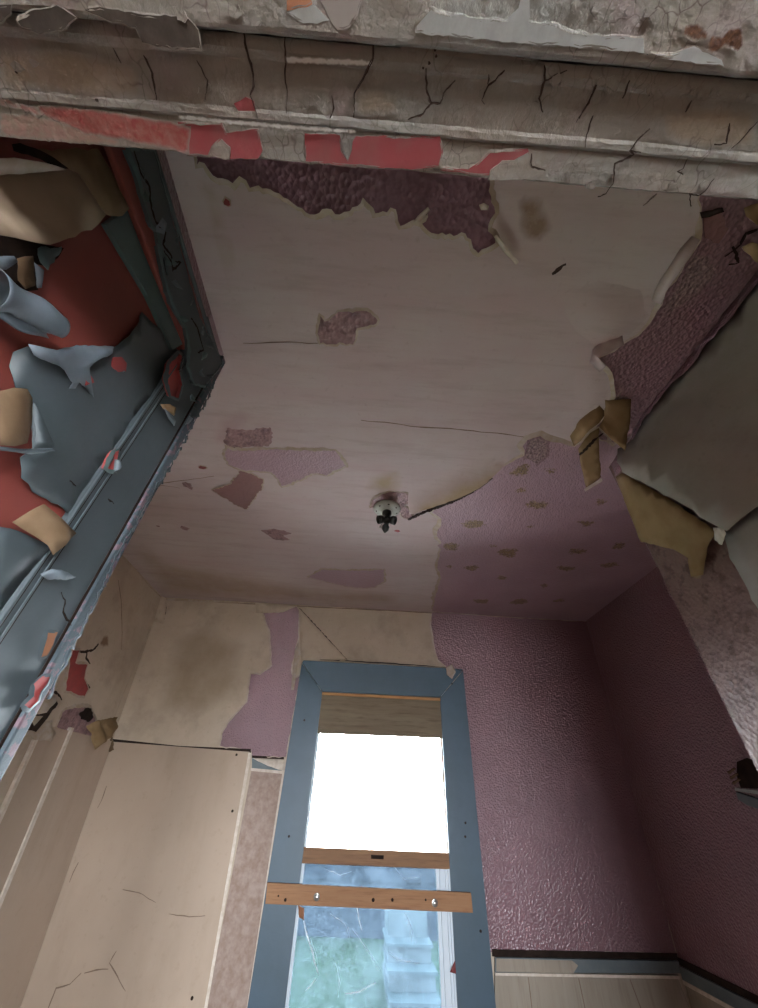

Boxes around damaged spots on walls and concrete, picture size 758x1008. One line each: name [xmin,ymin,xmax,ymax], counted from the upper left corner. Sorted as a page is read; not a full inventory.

peeling [0,3,202,53]
crack [243,33,258,118]
peeling [285,56,372,66]
crack [330,45,374,118]
crack [408,68,455,120]
peeling [414,0,725,66]
crack [598,128,650,197]
leakage [514,189,556,246]
peeling [0,97,533,532]
peeling [587,195,758,443]
crack [408,478,493,520]
peeling [20,586,104,736]